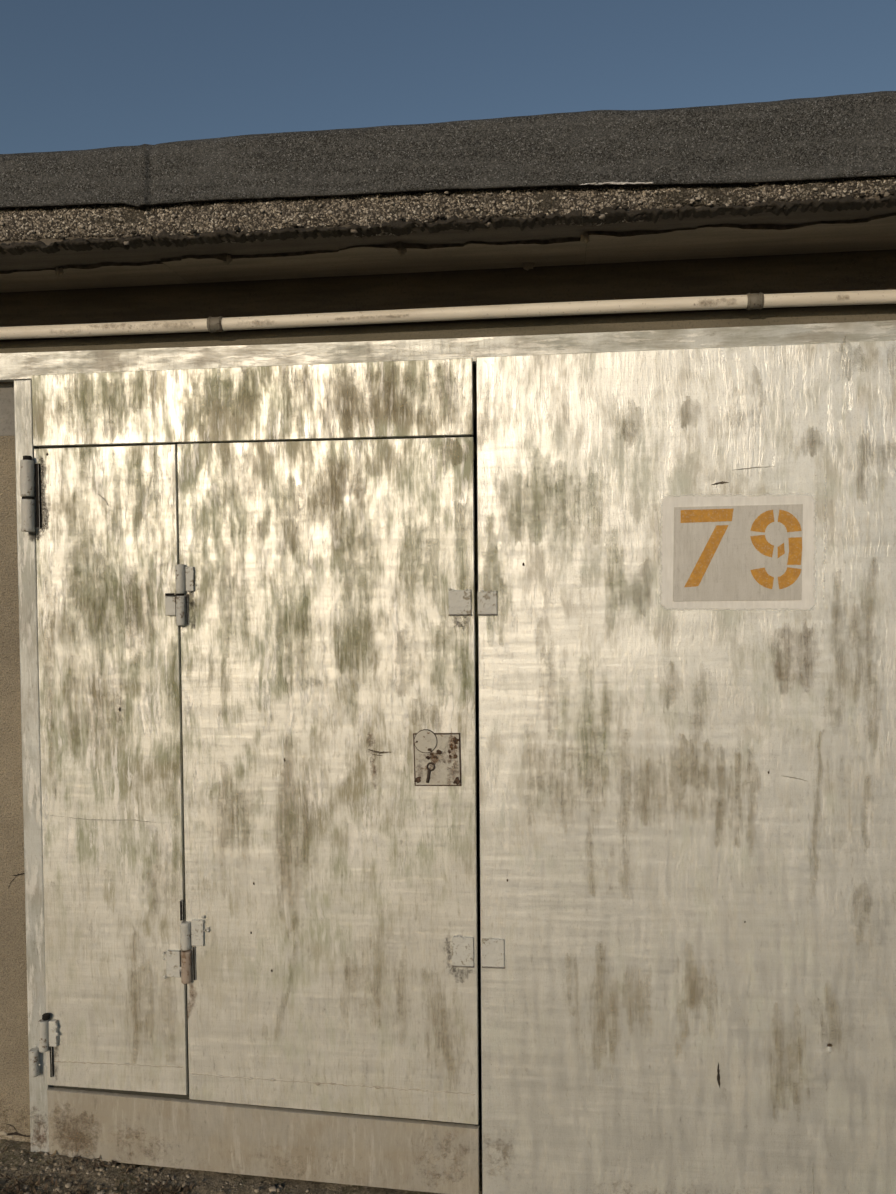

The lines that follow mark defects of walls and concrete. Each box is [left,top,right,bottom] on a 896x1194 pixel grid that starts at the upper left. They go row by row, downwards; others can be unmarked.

leakage [29,458,48,541]